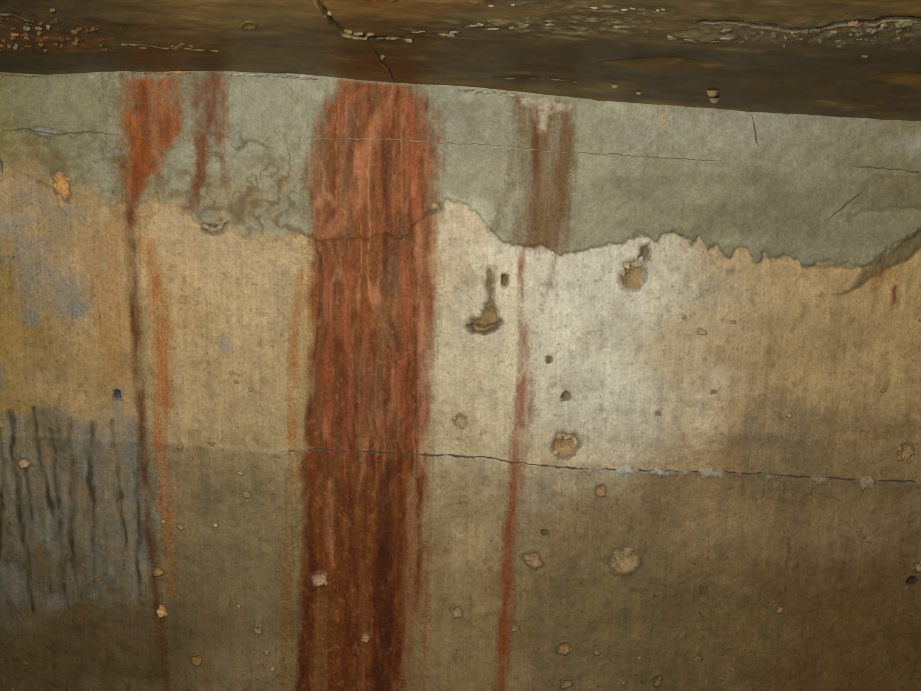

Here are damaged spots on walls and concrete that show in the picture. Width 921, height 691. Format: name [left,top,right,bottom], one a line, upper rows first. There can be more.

leakage [0,47,80,75]
flaking render [0,72,112,209]
flaking render [165,71,336,247]
crack [310,0,412,81]
leakage [395,0,679,39]
flaking render [559,96,921,295]
leakage [0,170,150,640]
rust [98,27,237,691]
rust [278,42,457,691]
spalling [462,264,510,336]
rust [486,92,580,691]
crack [280,442,921,491]